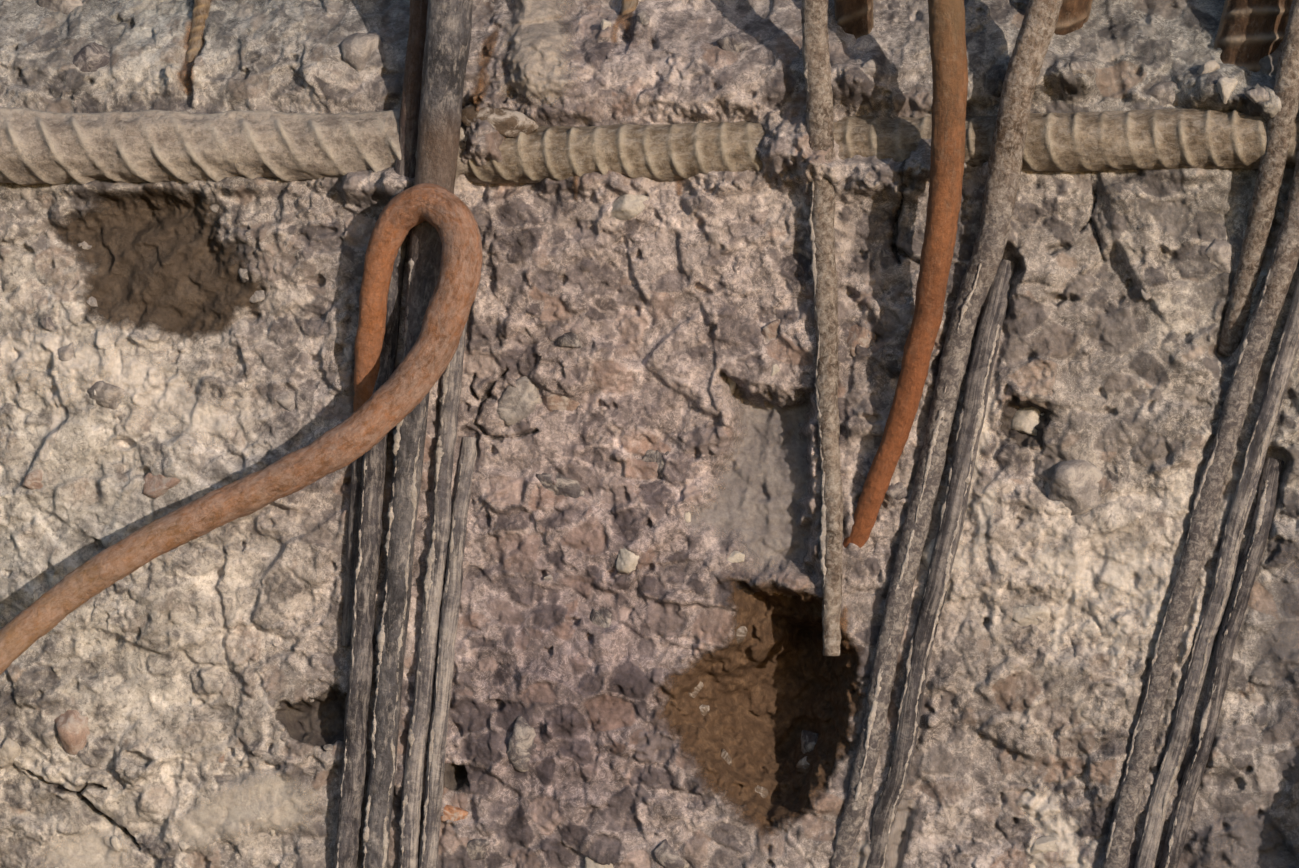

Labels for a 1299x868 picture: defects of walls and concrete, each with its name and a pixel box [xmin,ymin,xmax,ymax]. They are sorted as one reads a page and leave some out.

spalling [834,0,874,39]
spalling [1054,0,1093,35]
spalling [1214,0,1293,72]
spalling [455,121,766,184]
spalling [834,116,932,162]
spalling [964,115,997,167]
spalling [1022,108,1267,172]
spalling [1285,113,1299,168]
spalling [0,107,417,340]
spalling [684,378,813,574]
crack [32,773,139,846]
spalling [179,776,315,852]